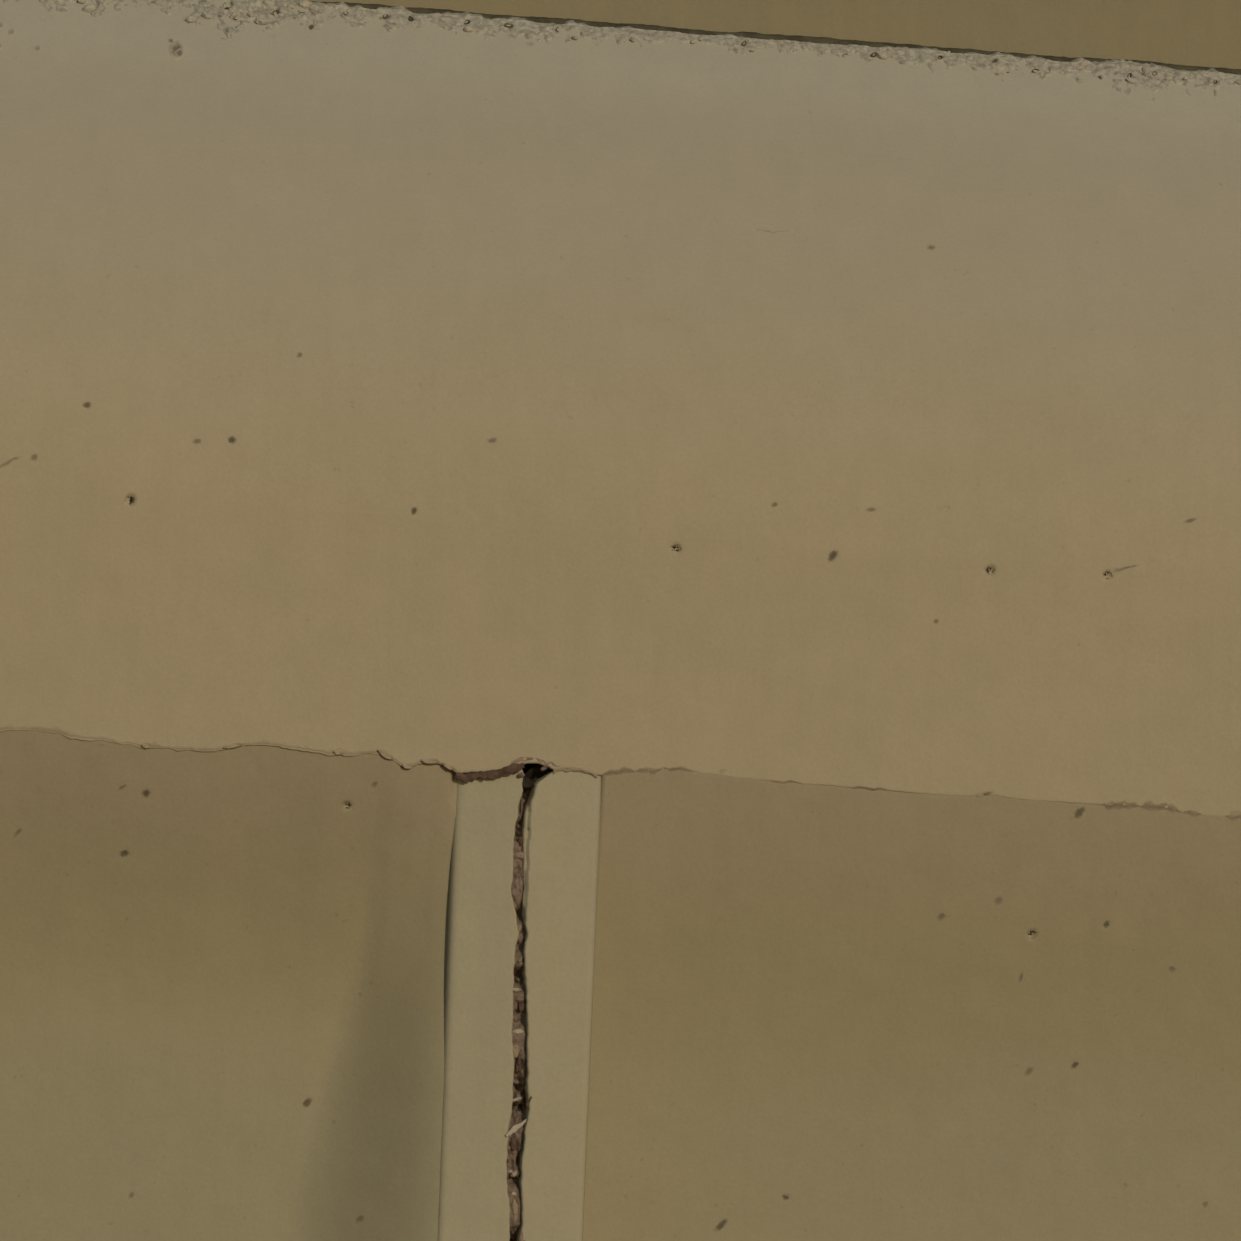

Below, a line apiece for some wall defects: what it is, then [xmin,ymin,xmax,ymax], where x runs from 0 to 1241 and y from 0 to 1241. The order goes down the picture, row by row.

spalling [38,0,1241,101]
peeling [1102,800,1202,818]
crack [506,764,543,1241]